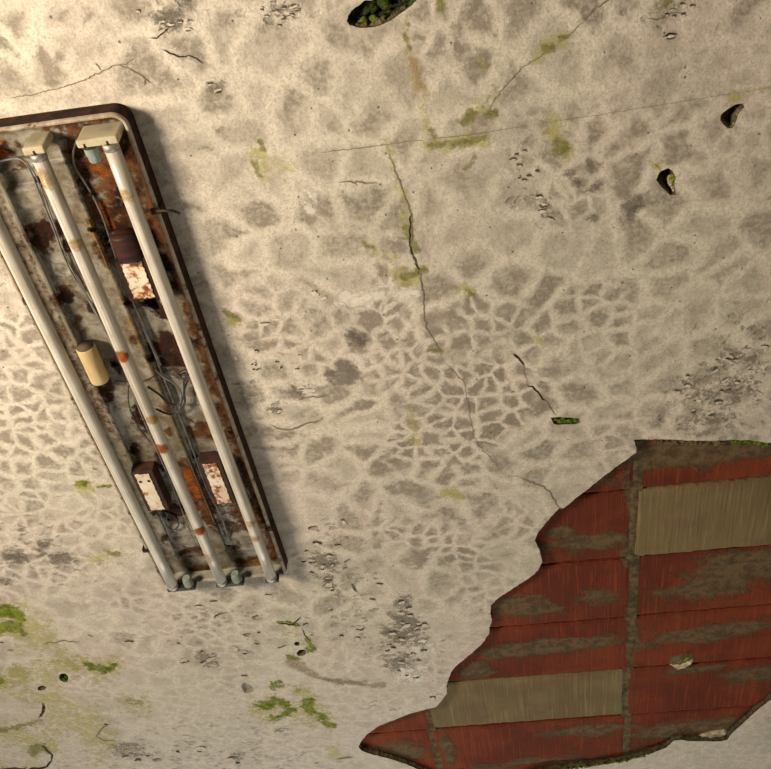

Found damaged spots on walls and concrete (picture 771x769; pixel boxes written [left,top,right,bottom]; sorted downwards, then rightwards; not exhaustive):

hole [720,103,744,129]
hole [656,168,676,195]
crack [321,0,771,508]
peeling [301,541,351,598]
spalling [360,345,771,769]
crack [1,745,53,769]